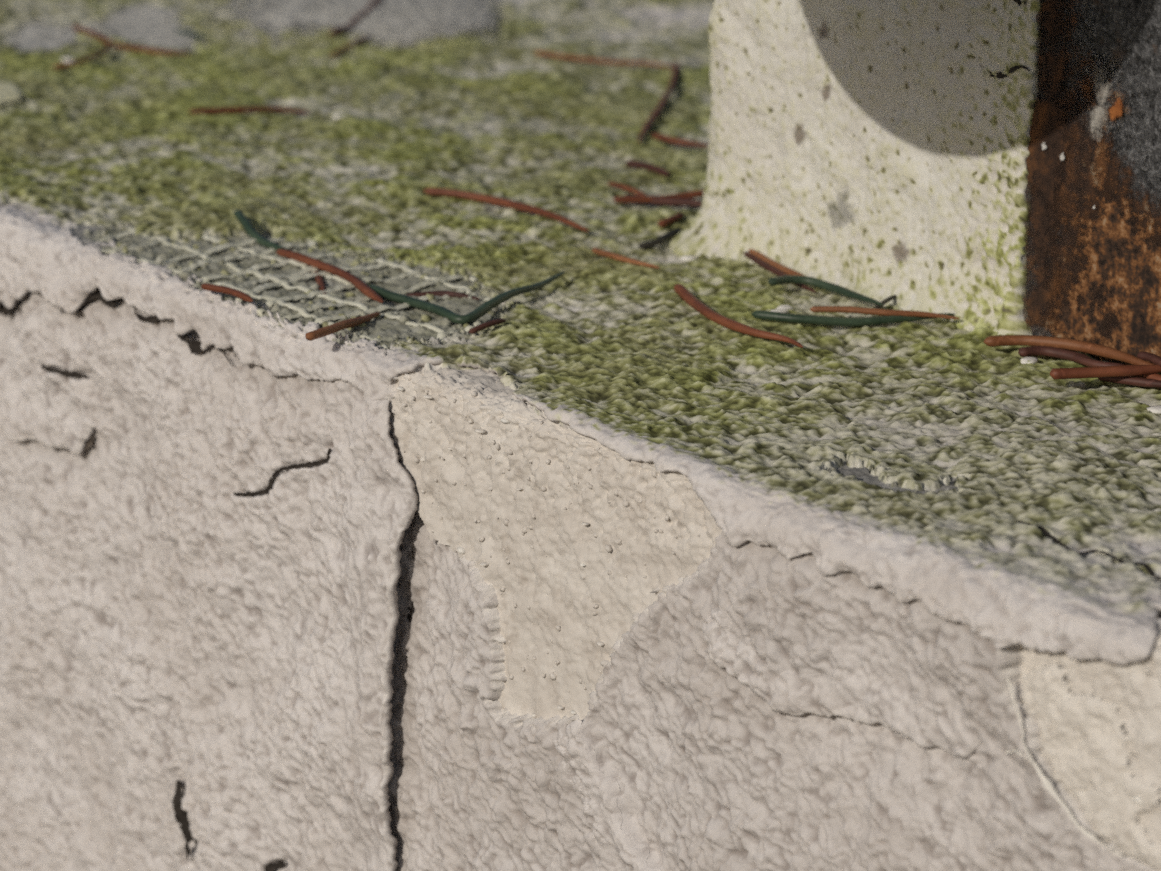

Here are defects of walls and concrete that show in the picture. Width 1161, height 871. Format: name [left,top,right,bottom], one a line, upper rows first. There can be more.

rust [1023,0,1161,365]
crack [0,291,30,317]
crack [233,448,331,497]
spalling [0,225,1161,871]
crack [1016,521,1161,581]
crack [403,596,414,628]